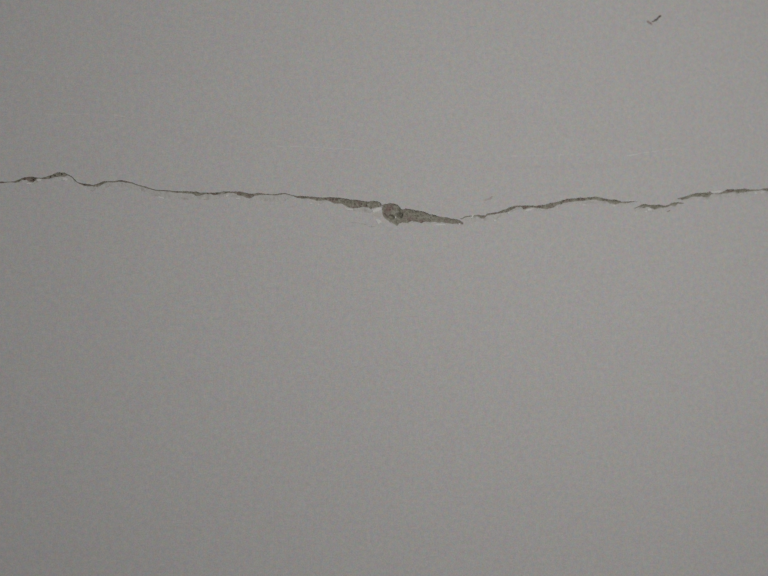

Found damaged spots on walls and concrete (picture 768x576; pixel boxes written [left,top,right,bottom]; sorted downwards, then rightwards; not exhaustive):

crack [0,172,382,213]
crack [461,188,768,223]